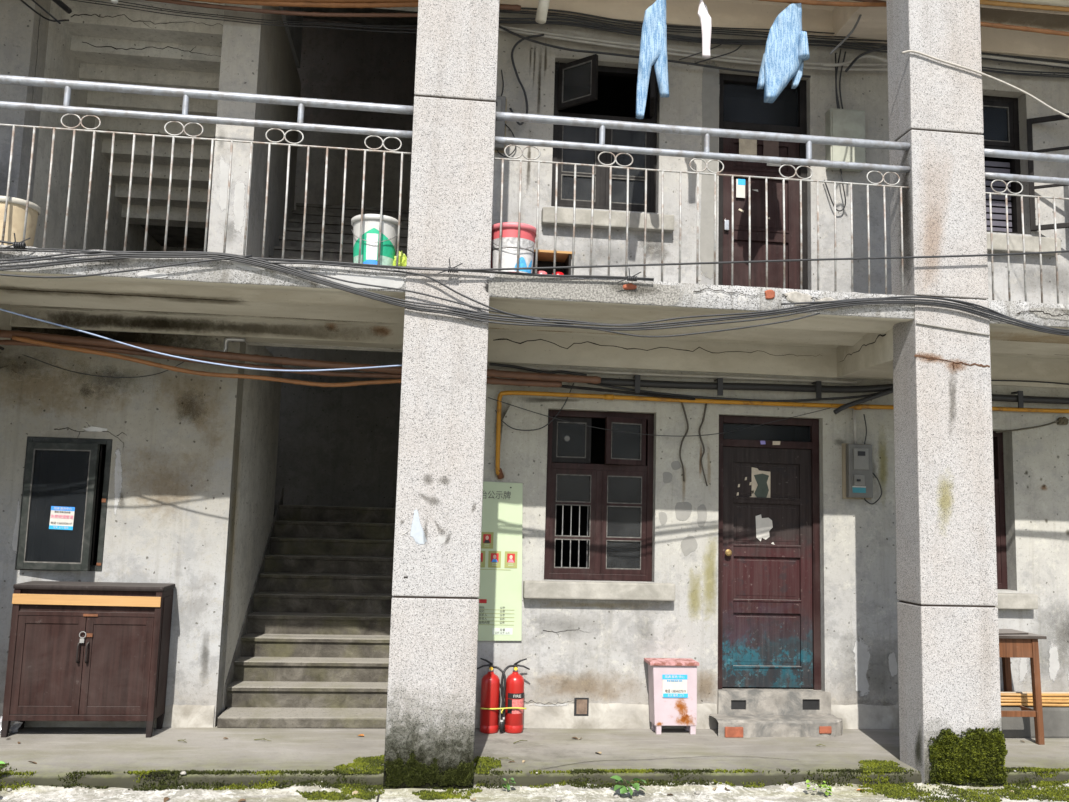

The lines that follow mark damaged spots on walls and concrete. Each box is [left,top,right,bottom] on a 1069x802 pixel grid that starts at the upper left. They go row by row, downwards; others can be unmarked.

crack [493,334,886,362]
crack [914,354,990,370]
peeling [659,502,707,556]
peeling [853,638,870,697]
peeling [1019,658,1027,682]
peeling [1049,643,1069,681]
damp [383,741,474,789]